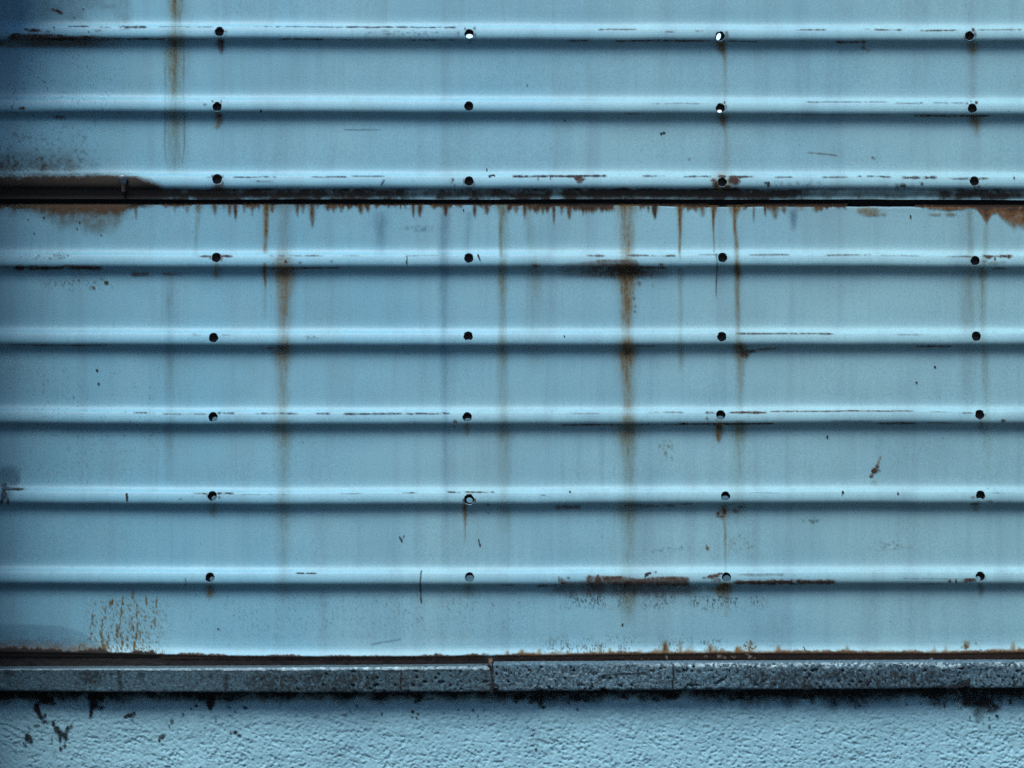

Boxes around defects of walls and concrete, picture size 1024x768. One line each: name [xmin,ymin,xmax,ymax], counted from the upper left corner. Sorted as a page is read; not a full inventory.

corrosion [0,173,193,226]
corrosion [213,203,274,248]
corrosion [711,175,741,191]
corrosion [915,205,1024,226]
corrosion [295,203,846,324]
corrosion [263,260,292,315]
corrosion [735,343,769,357]
corrosion [620,338,635,453]
corrosion [582,575,689,595]
corrosion [703,573,731,595]
corrosion [0,592,1024,661]